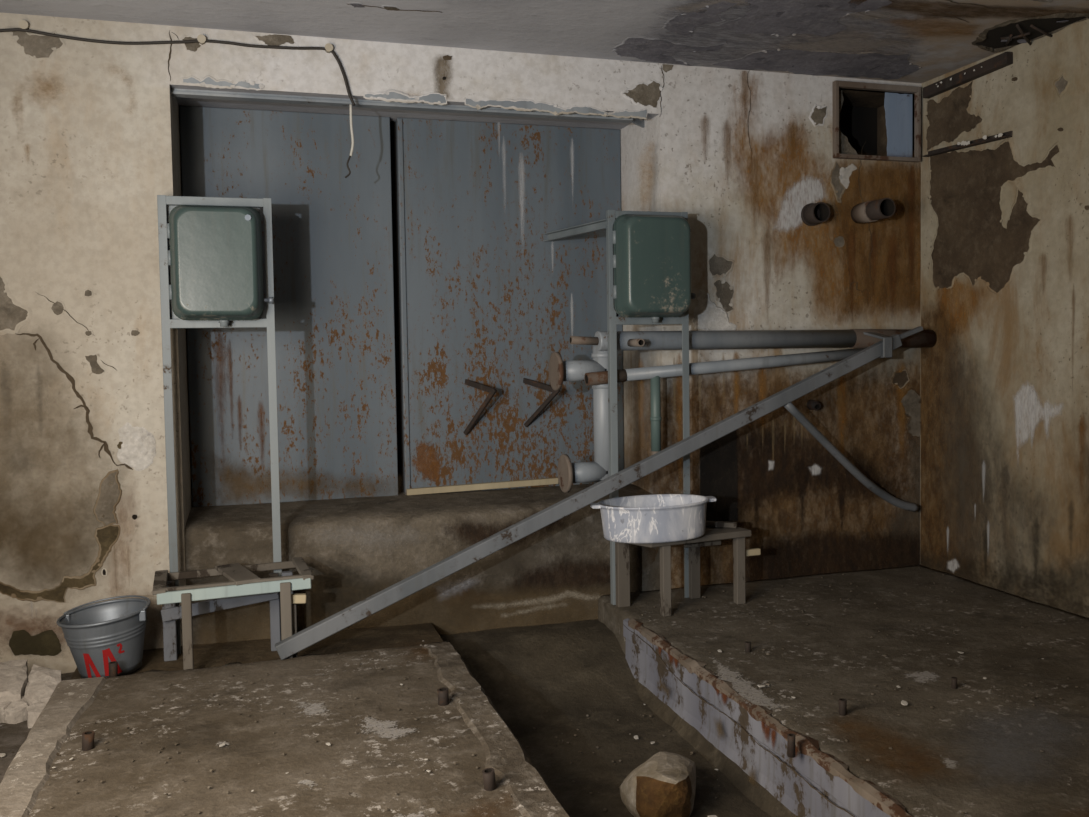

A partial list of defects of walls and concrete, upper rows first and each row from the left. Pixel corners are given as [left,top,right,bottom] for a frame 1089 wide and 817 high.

peeling [464,37,922,119]
spalling [972,12,1089,53]
flaking render [924,66,1065,295]
flaking render [0,272,32,336]
crack [17,333,133,470]
rust [639,354,809,458]
rust [700,114,983,586]
flaking render [0,442,123,603]
rust [412,441,443,484]
rust [654,544,684,589]
rust [640,448,700,495]
water stain [745,369,1089,618]